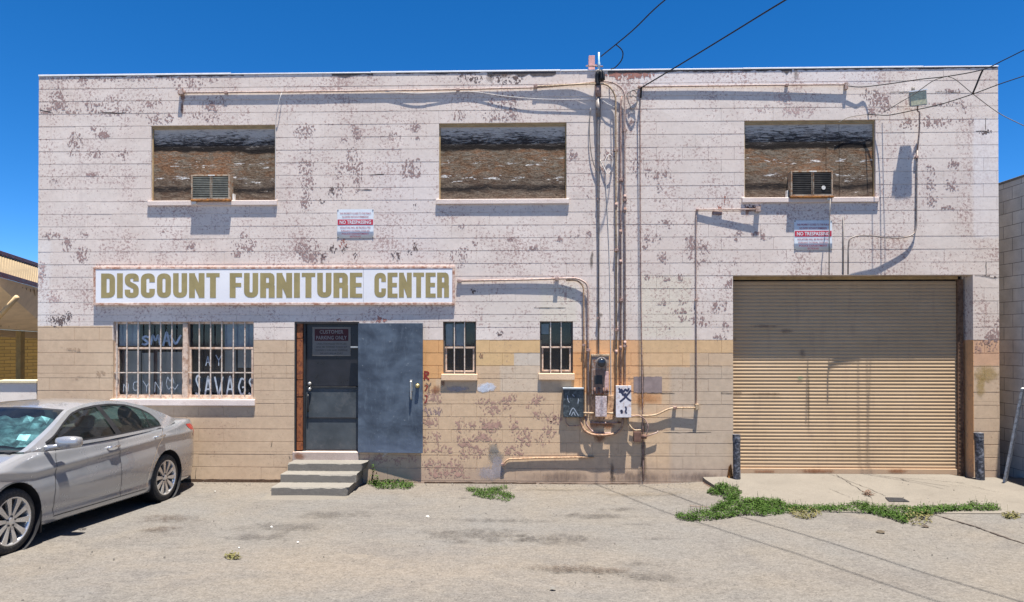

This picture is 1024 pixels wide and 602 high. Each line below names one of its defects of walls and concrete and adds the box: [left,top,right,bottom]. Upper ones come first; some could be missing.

peeling [40,76,226,159]
peeling [457,72,523,122]
peeling [860,88,893,117]
peeling [293,122,363,211]
peeling [926,159,960,209]
peeling [42,232,91,263]
peeling [230,231,257,257]
peeling [295,235,357,265]
peeling [642,219,683,281]
peeling [685,233,737,267]
peeling [658,299,729,341]
peeling [362,389,577,484]